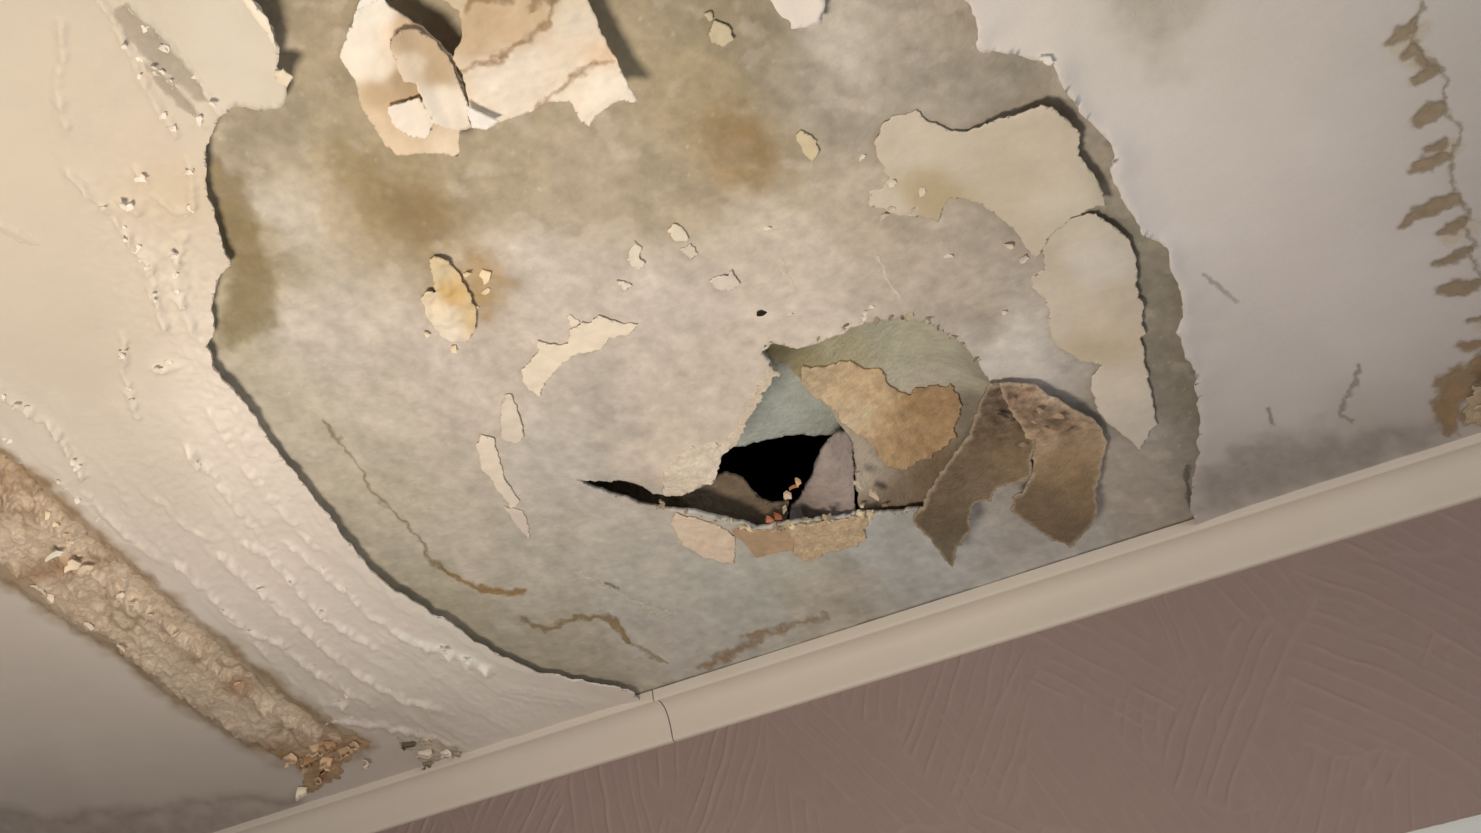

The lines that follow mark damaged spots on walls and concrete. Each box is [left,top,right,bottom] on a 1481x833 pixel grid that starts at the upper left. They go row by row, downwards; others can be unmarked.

damp [1385,2,1481,297]
peeling [205,0,1200,695]
damp [1432,341,1481,436]
damp [1,450,147,582]
damp [0,564,70,618]
spalling [0,449,370,801]
crack [401,520,665,662]
damp [244,667,353,736]